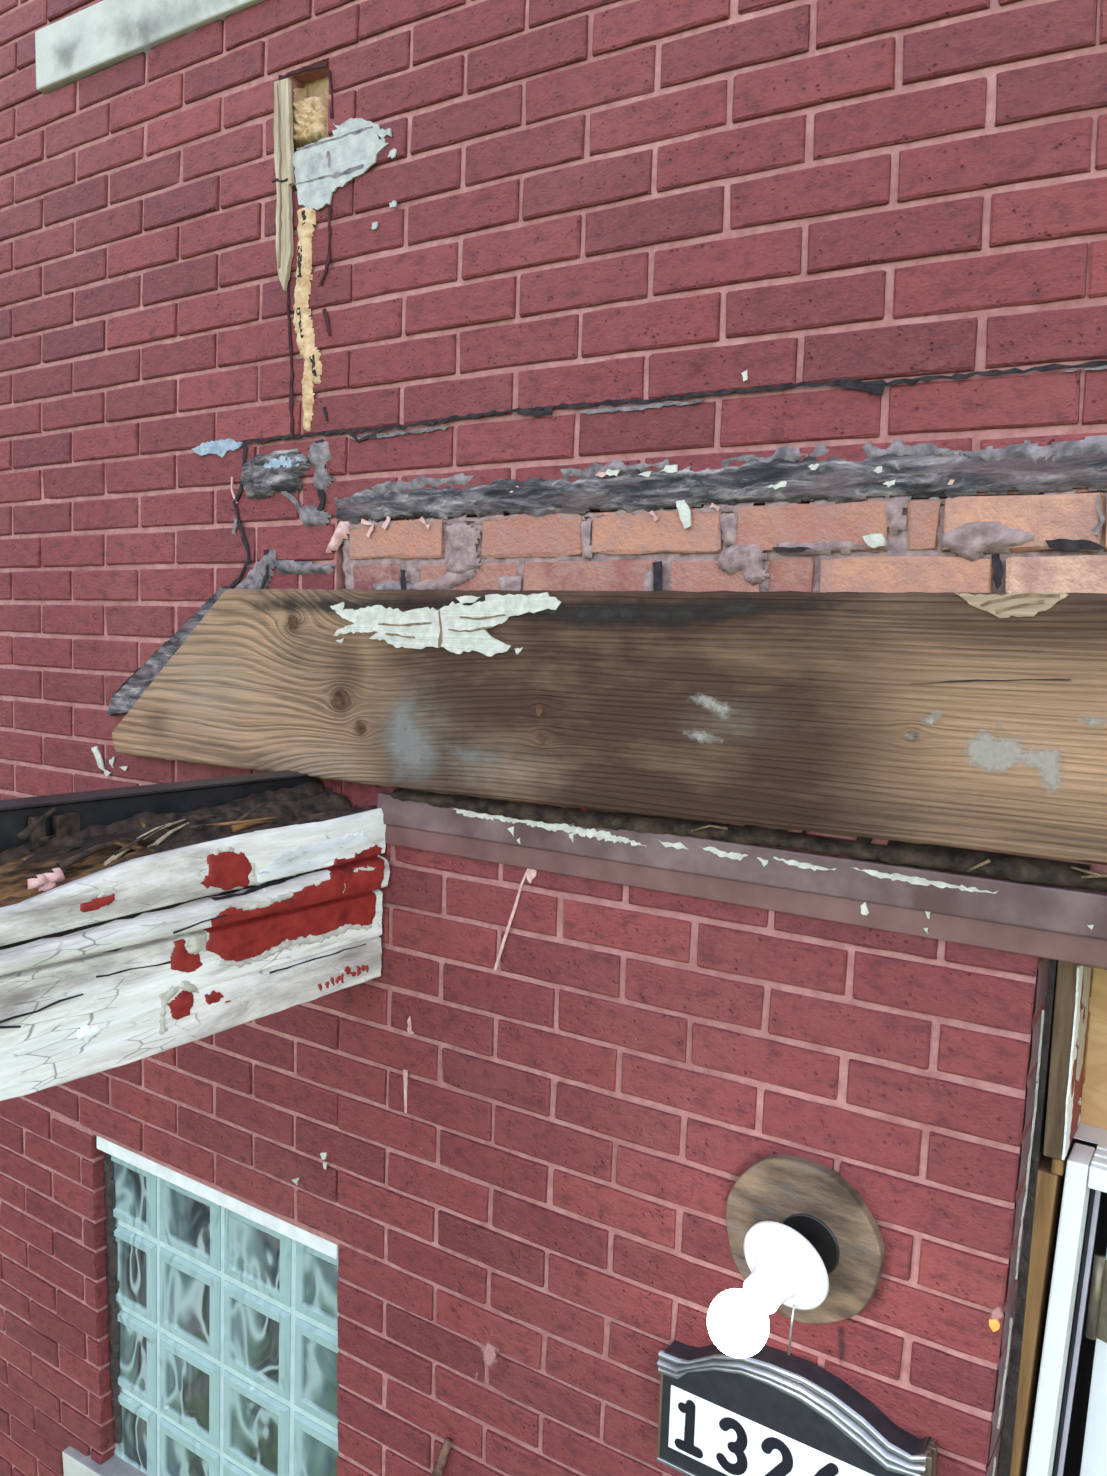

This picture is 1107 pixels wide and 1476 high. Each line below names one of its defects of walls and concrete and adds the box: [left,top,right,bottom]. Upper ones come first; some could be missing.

flaking render [293,118,397,210]
crack [230,62,1107,589]
peeling [263,455,302,469]
flaking render [330,465,1107,657]
crack [114,634,174,694]
peeling [452,808,998,894]
peeling [80,891,116,912]
peeling [159,831,385,1035]
peeling [1062,965,1094,1160]